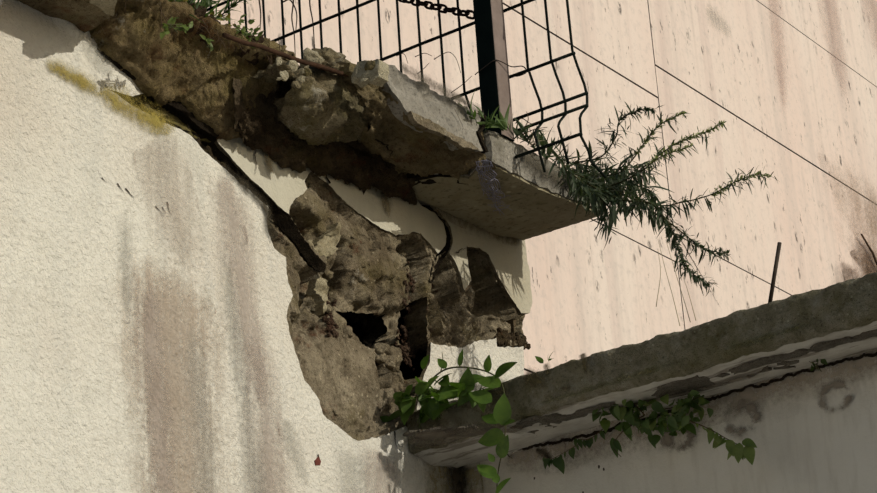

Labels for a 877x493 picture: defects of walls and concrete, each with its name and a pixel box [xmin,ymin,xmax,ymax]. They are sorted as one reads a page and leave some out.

leakage [49,63,98,93]
crack [100,42,326,273]
leakage [220,168,272,238]
crack [407,173,469,185]
spalling [407,111,479,151]
crack [476,115,489,153]
crack [421,205,465,282]
spalling [267,172,527,441]
leakage [134,269,212,493]
peeling [512,402,616,436]
leakage [625,350,877,449]
peeling [651,329,877,397]